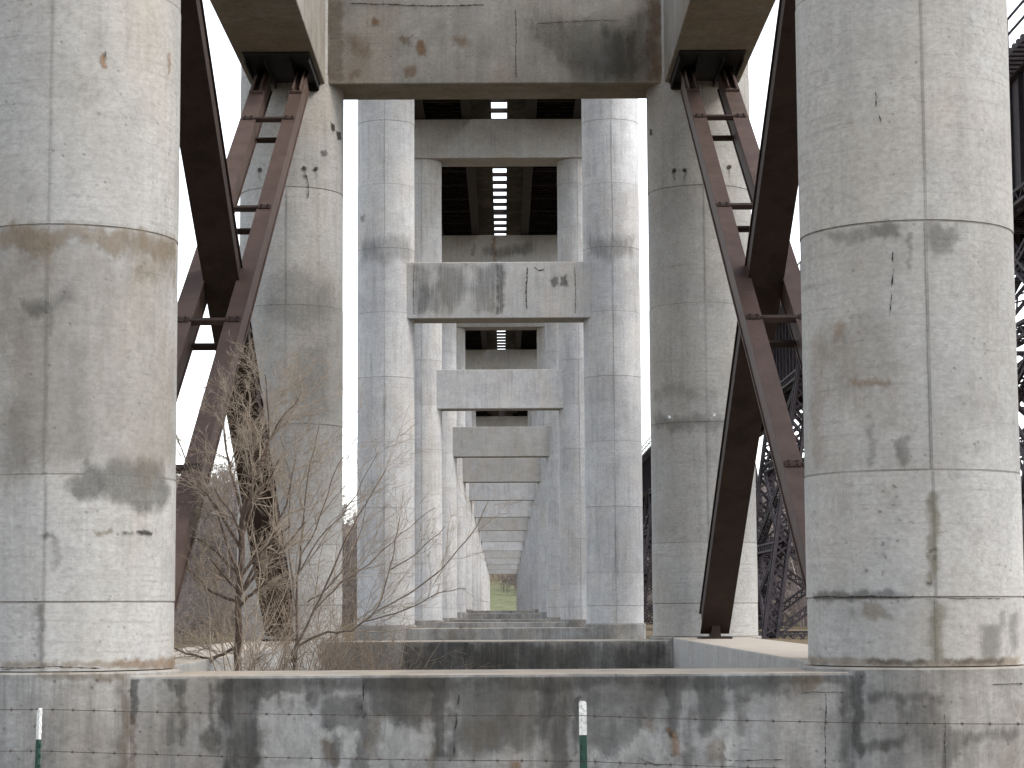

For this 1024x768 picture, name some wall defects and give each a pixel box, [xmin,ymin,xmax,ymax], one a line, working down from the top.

corrosion [400,36,425,54]
water stain [0,225,176,259]
water stain [72,461,169,511]
water stain [816,589,893,601]
water stain [949,656,1020,666]
water stain [165,679,185,694]
water stain [380,641,936,768]
water stain [200,678,369,768]